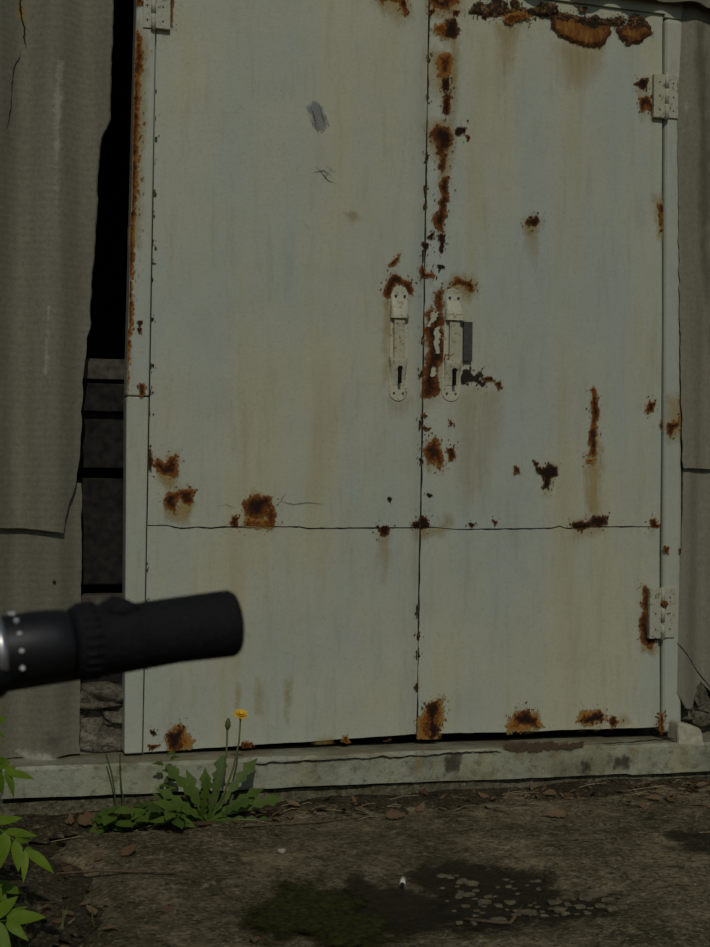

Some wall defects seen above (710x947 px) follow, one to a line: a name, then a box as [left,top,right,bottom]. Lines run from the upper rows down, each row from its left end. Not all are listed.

crack [6,0,26,129]
rust [127,30,152,407]
rust [380,0,482,398]
rust [418,413,458,473]
rust [582,386,604,467]
rust [149,445,198,519]
rust [227,494,283,535]
rust [638,580,658,649]
rust [147,717,196,751]
rust [414,693,450,740]
rust [504,702,551,735]
water stain [325,873,483,941]